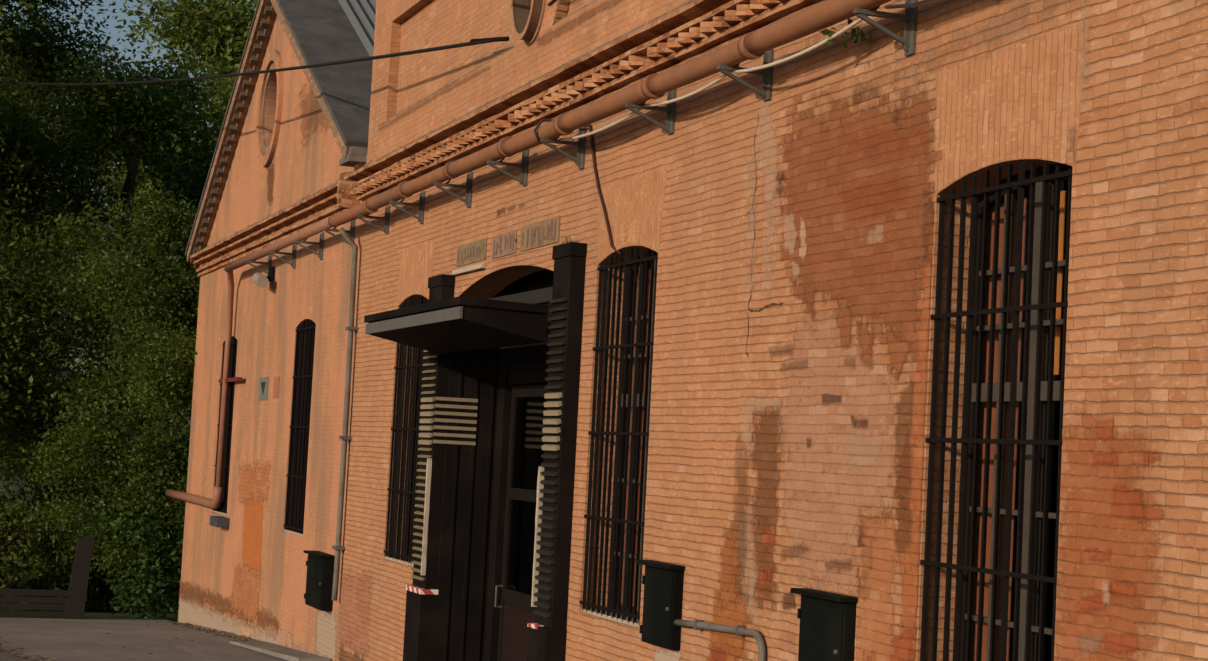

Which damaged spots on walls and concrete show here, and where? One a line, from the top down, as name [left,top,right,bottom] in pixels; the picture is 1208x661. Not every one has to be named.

crack [745,116,784,357]
peeling [776,83,941,381]